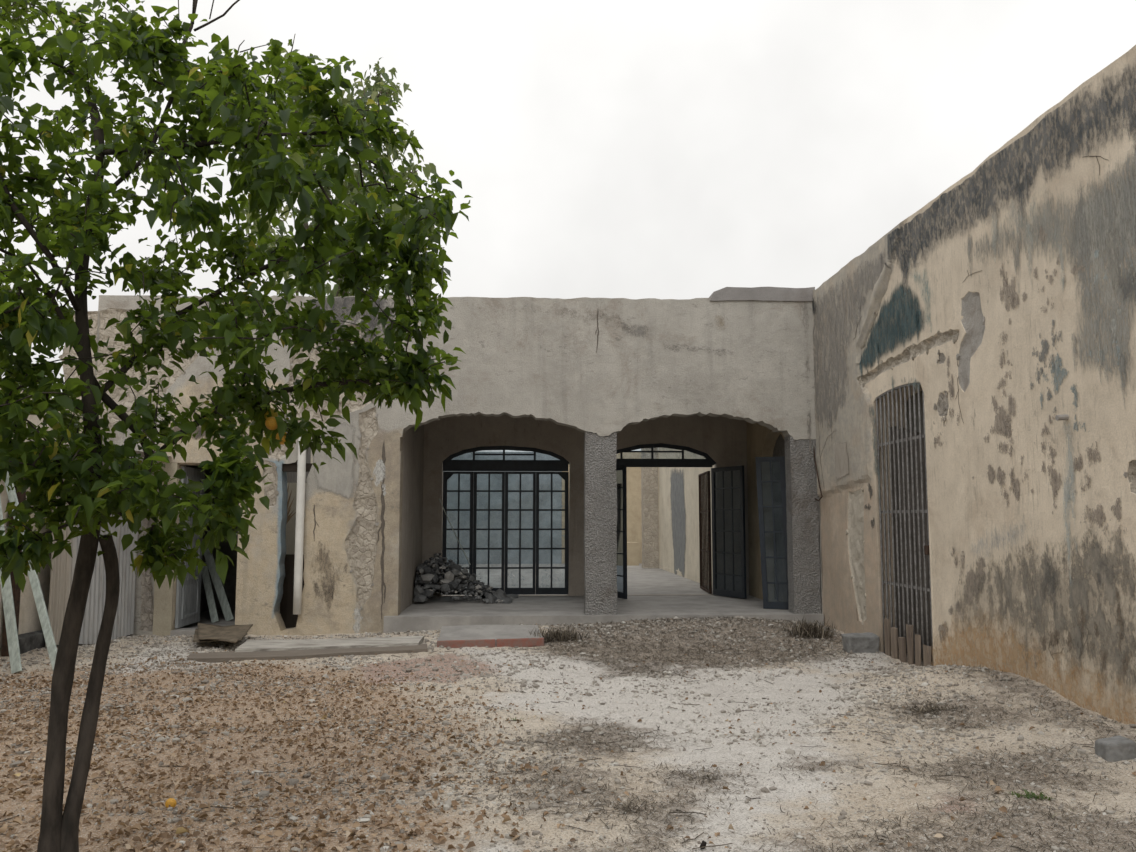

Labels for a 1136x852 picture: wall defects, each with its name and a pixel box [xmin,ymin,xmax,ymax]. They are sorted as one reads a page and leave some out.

flaking render [262,324,386,633]
flaking render [857,292,985,447]
leakage [803,67,1136,452]
peeling [972,253,1100,515]
leakage [956,435,1136,692]
peeling [1080,460,1136,536]